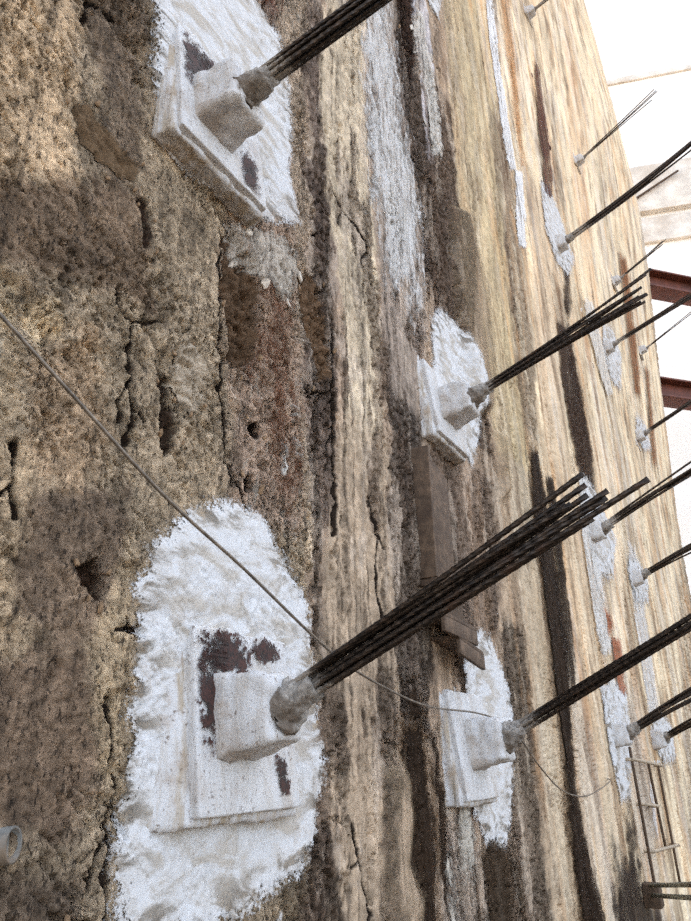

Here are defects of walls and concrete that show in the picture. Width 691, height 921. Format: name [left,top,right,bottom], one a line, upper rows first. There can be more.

corrosion [180,30,215,88]
corrosion [242,151,262,194]
leakage [361,4,425,310]
crack [114,291,158,447]
crack [0,440,17,520]
corrosion [605,610,622,660]
corrosion [195,627,281,757]
corrosion [617,673,627,695]
crack [83,696,118,921]
corrosion [275,752,291,797]
crack [350,823,373,921]